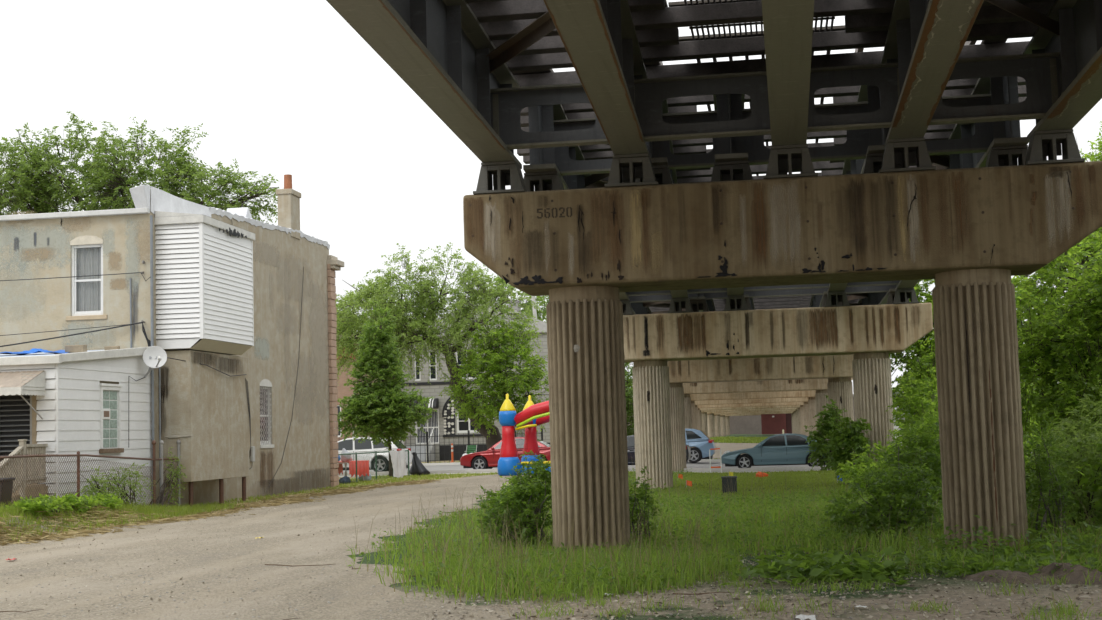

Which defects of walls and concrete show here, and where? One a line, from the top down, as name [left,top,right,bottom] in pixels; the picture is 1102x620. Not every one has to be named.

leakage [631,194,641,266]
spalling [502,258,563,285]
spalling [697,242,737,278]